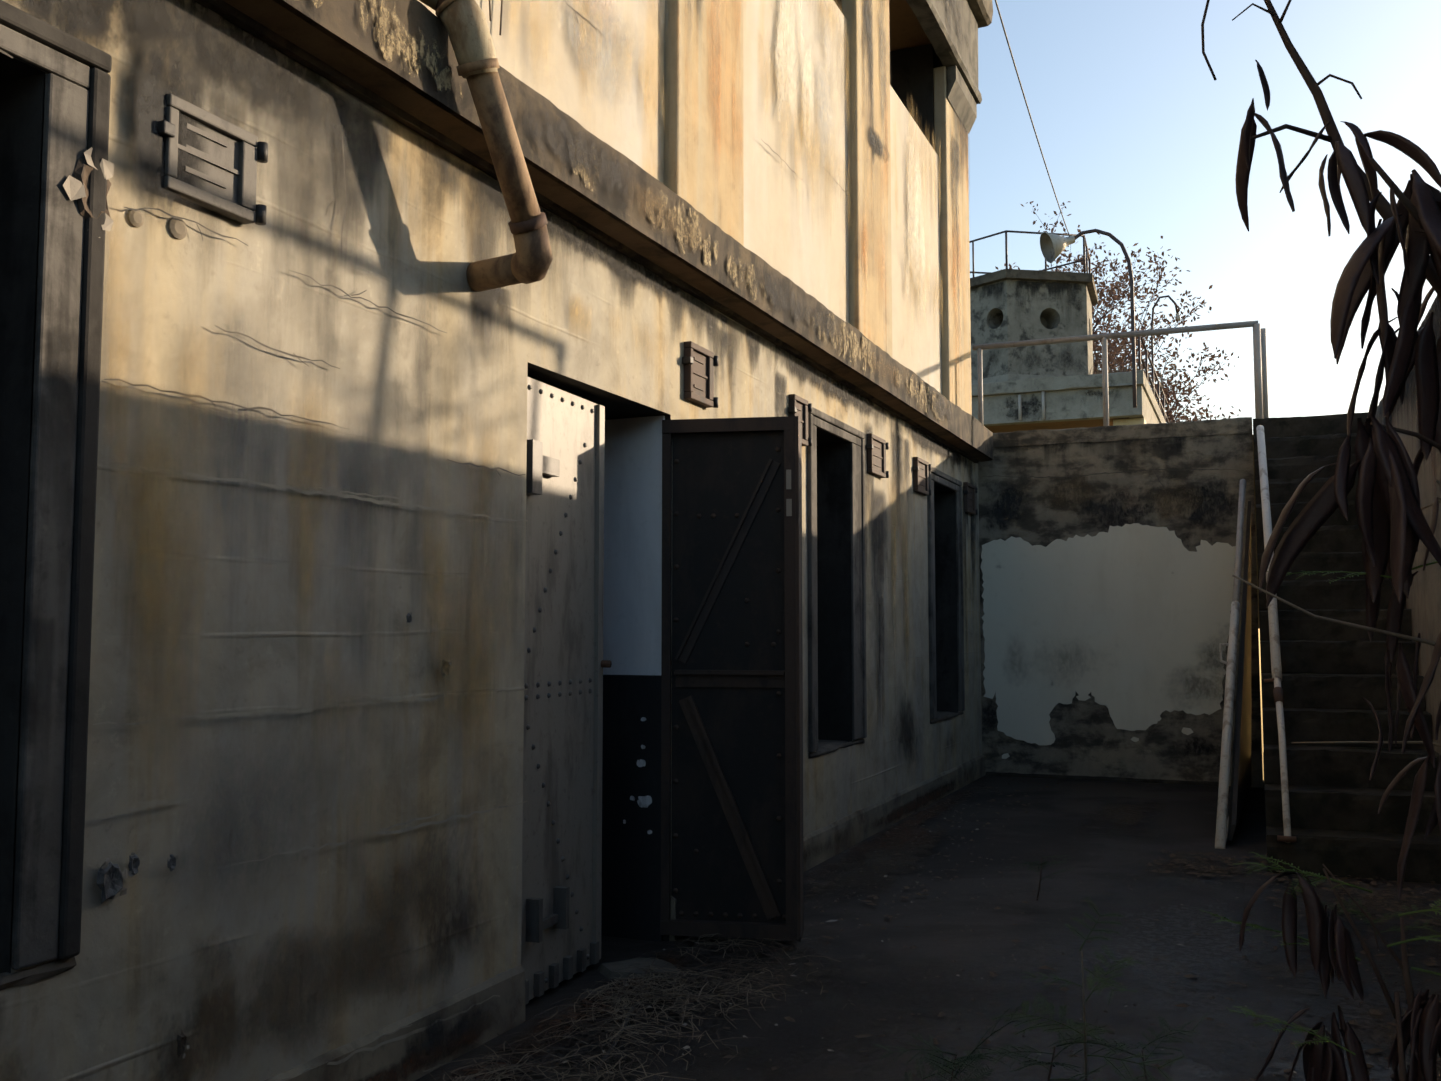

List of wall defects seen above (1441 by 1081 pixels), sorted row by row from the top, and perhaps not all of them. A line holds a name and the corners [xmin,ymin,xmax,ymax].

peeling [360,0,462,95]
damp [863,0,873,103]
spalling [63,147,114,238]
damp [22,0,391,219]
damp [441,155,511,260]
damp [868,127,884,156]
damp [952,115,968,182]
damp [475,287,509,322]
damp [1418,296,1441,346]
damp [538,204,1027,583]
peeling [981,523,1236,759]
peeling [630,795,652,808]